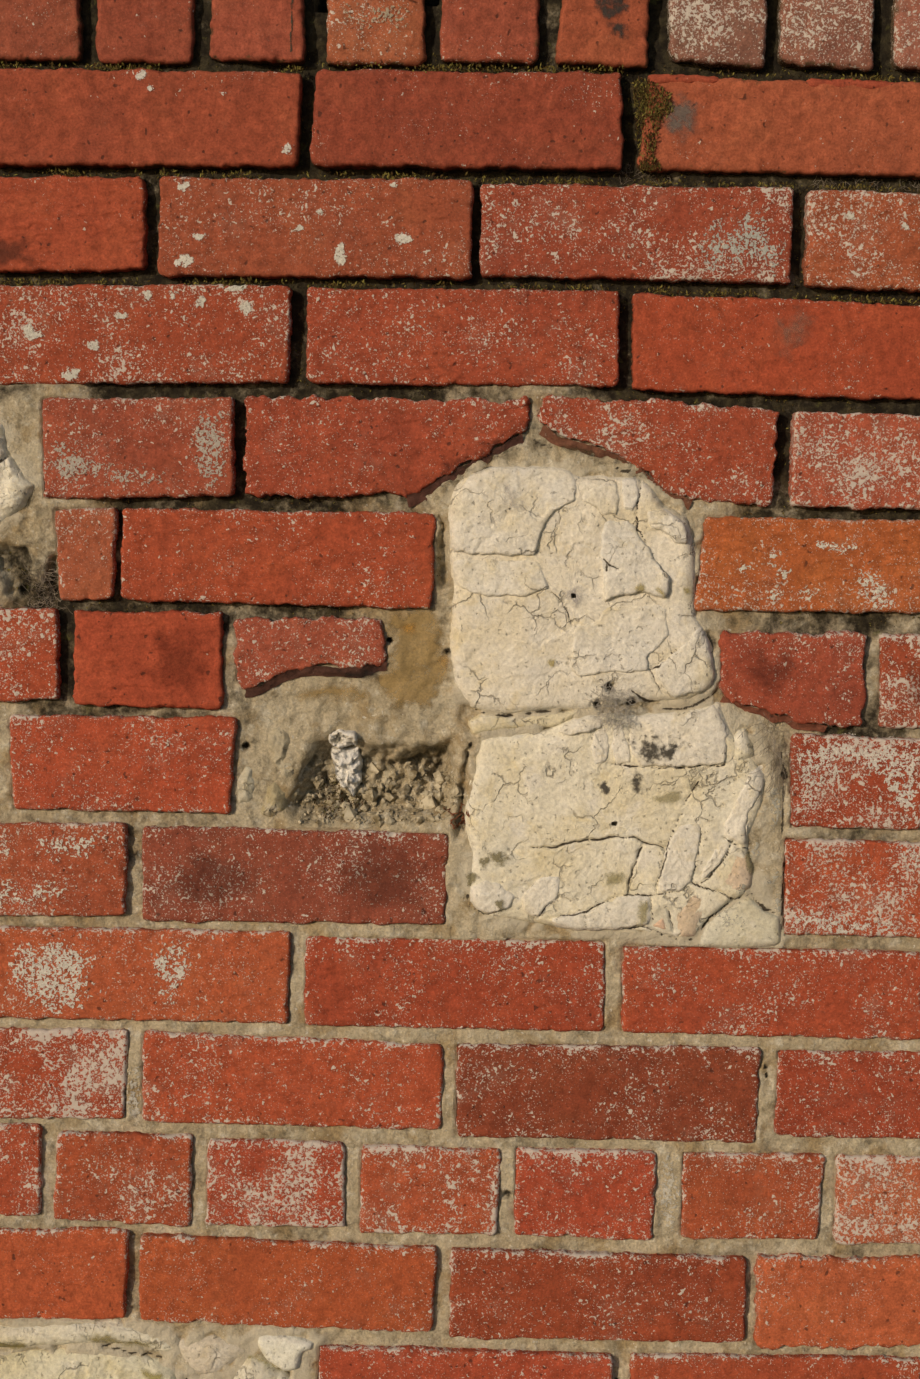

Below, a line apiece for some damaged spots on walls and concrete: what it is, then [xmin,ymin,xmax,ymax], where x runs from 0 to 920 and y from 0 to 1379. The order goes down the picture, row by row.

crack [615,467,645,540]
spalling [245,662,388,698]
crack [631,649,714,710]
crack [461,709,551,800]
crack [532,752,788,941]
leakage [886,843,920,874]
leakage [785,911,898,940]
leakage [5,938,101,1017]
leakage [150,940,191,1005]
crack [102,1344,187,1379]